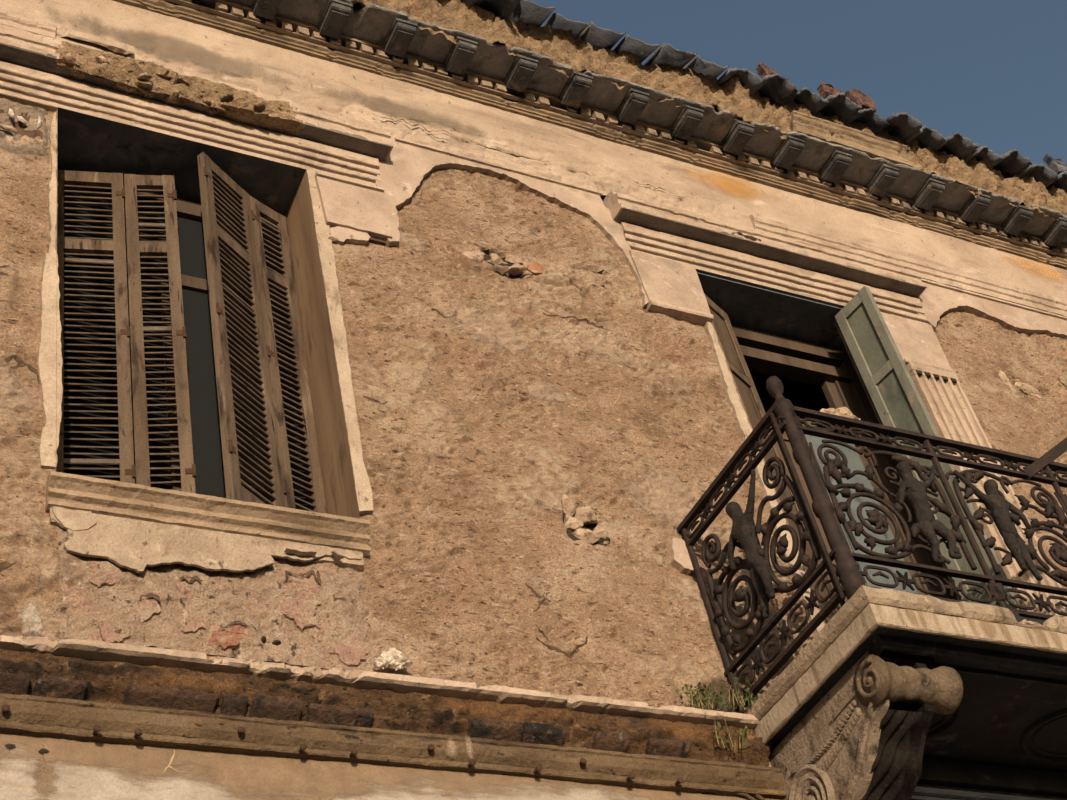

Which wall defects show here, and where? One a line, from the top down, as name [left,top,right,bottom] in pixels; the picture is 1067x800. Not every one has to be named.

spalling [55,45,285,122]
spalling [0,98,48,157]
hole [462,249,544,279]
spalling [998,370,1042,399]
hole [561,494,610,546]
spalling [49,506,376,672]
spalling [0,648,772,767]
damp [0,733,784,800]